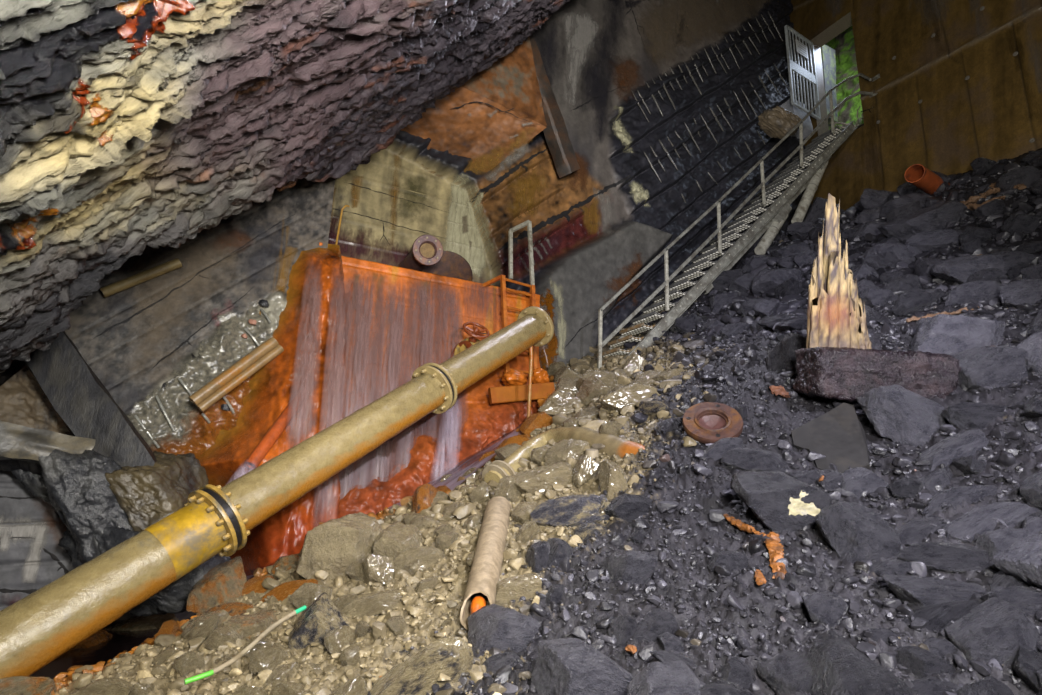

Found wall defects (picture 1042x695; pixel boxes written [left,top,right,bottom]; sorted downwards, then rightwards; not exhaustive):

crack [450,101,540,125]
crack [344,182,446,212]
crack [469,149,547,202]
crack [335,209,442,242]
rust [539,289,560,371]
rust [156,373,255,457]